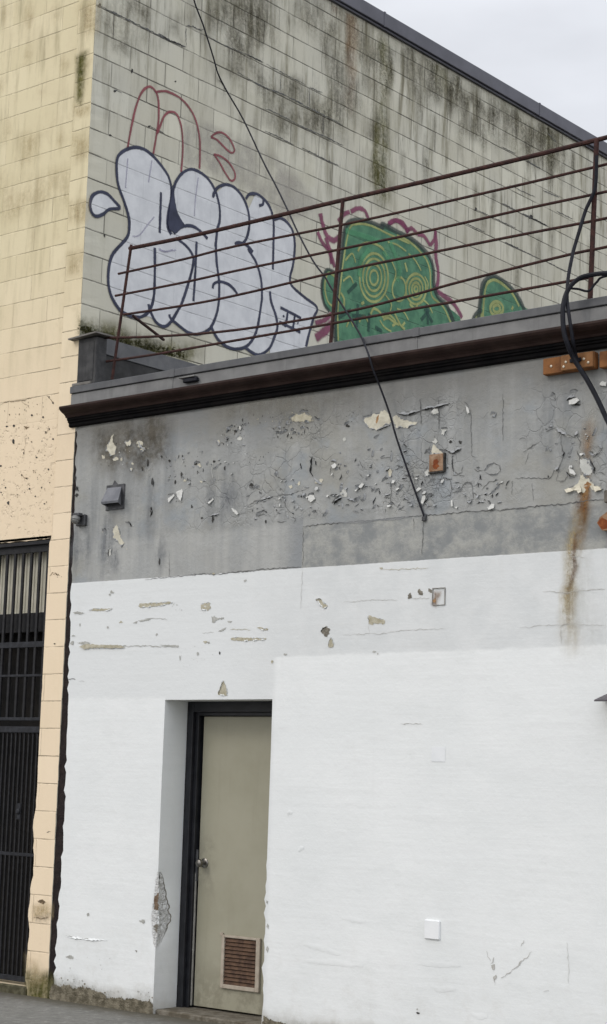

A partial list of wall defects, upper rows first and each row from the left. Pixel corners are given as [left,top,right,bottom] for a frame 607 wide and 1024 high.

damp [77,55,85,112]
flaking render [0,397,54,517]
peeling [102,435,147,471]
peeling [217,409,320,446]
peeling [289,410,434,517]
crack [145,397,602,592]
peeling [424,427,462,455]
peeling [562,427,602,493]
rust [580,489,589,517]
peeling [70,601,268,666]
peeling [321,626,334,647]
spalling [139,872,171,947]